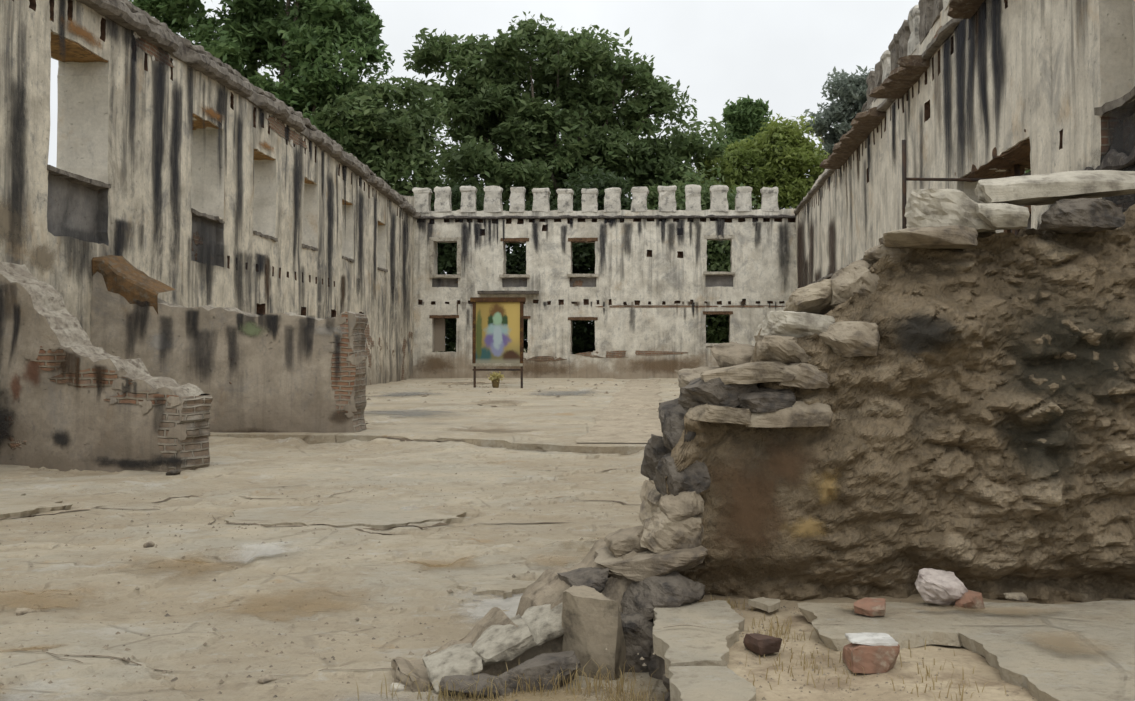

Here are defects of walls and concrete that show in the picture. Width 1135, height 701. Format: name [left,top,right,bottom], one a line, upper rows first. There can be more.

water stain [942,0,1004,184]
water stain [153,63,193,241]
water stain [217,86,243,238]
water stain [285,124,434,318]
water stain [460,219,505,270]
water stain [600,219,641,268]
water stain [657,218,701,257]
water stain [257,254,312,356]
spalling [25,340,187,472]
spalling [317,312,365,418]
crack [365,423,551,471]
crack [0,484,641,535]